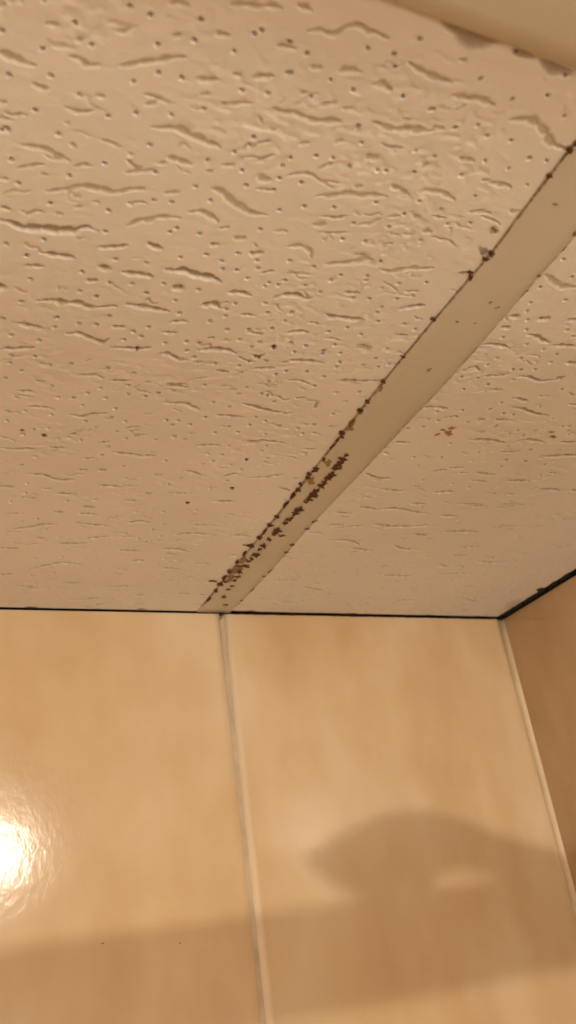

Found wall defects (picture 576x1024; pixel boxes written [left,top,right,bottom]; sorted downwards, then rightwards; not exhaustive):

corrosion [204,141,576,607]